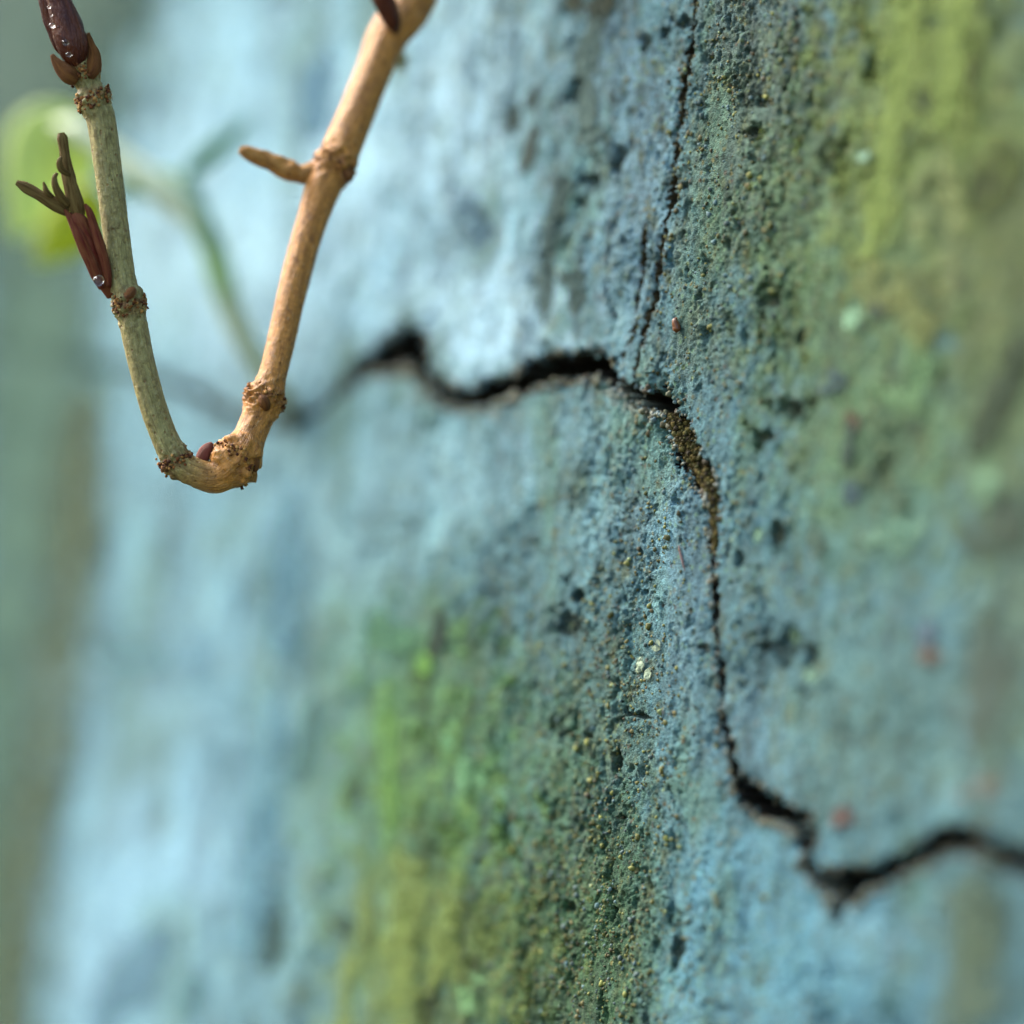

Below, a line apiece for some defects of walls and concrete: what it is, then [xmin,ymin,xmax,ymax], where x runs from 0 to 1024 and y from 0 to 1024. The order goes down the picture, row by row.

crack [159,374,243,426]
crack [270,0,1024,926]